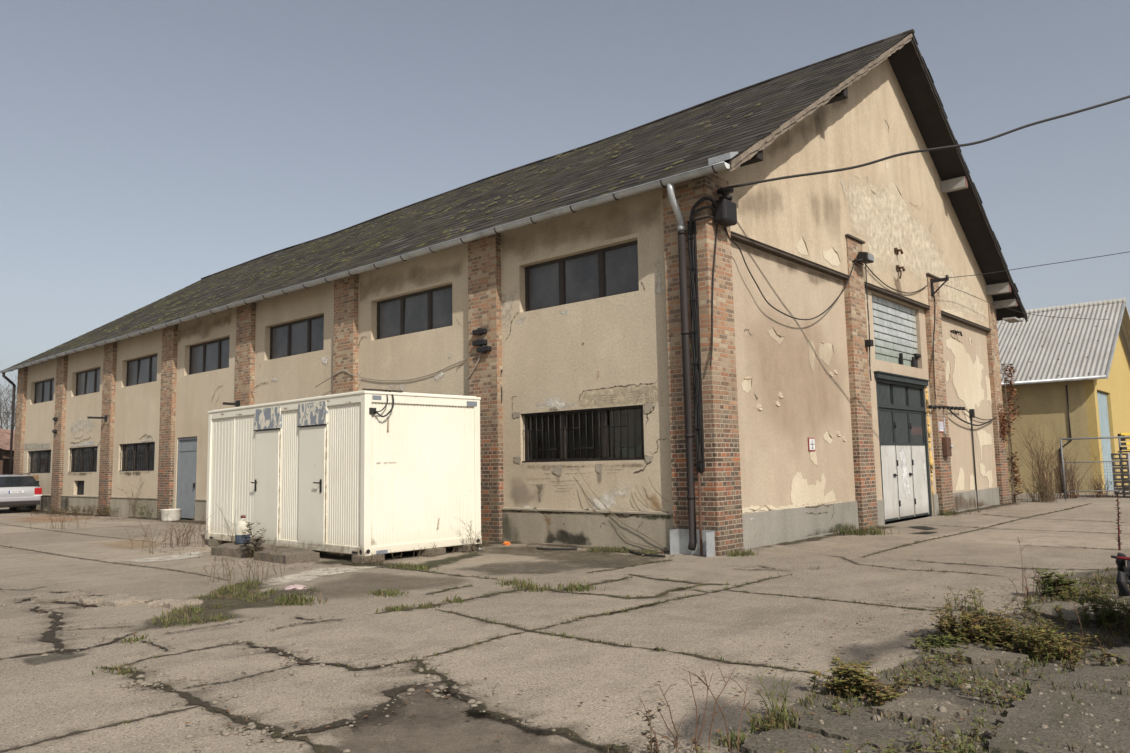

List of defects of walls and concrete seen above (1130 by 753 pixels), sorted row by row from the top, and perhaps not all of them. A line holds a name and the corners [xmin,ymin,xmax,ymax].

peeling [808,341,834,372]
peeling [945,335,993,491]
peeling [742,451,842,513]
crack [806,503,834,520]
crack [0,586,631,753]